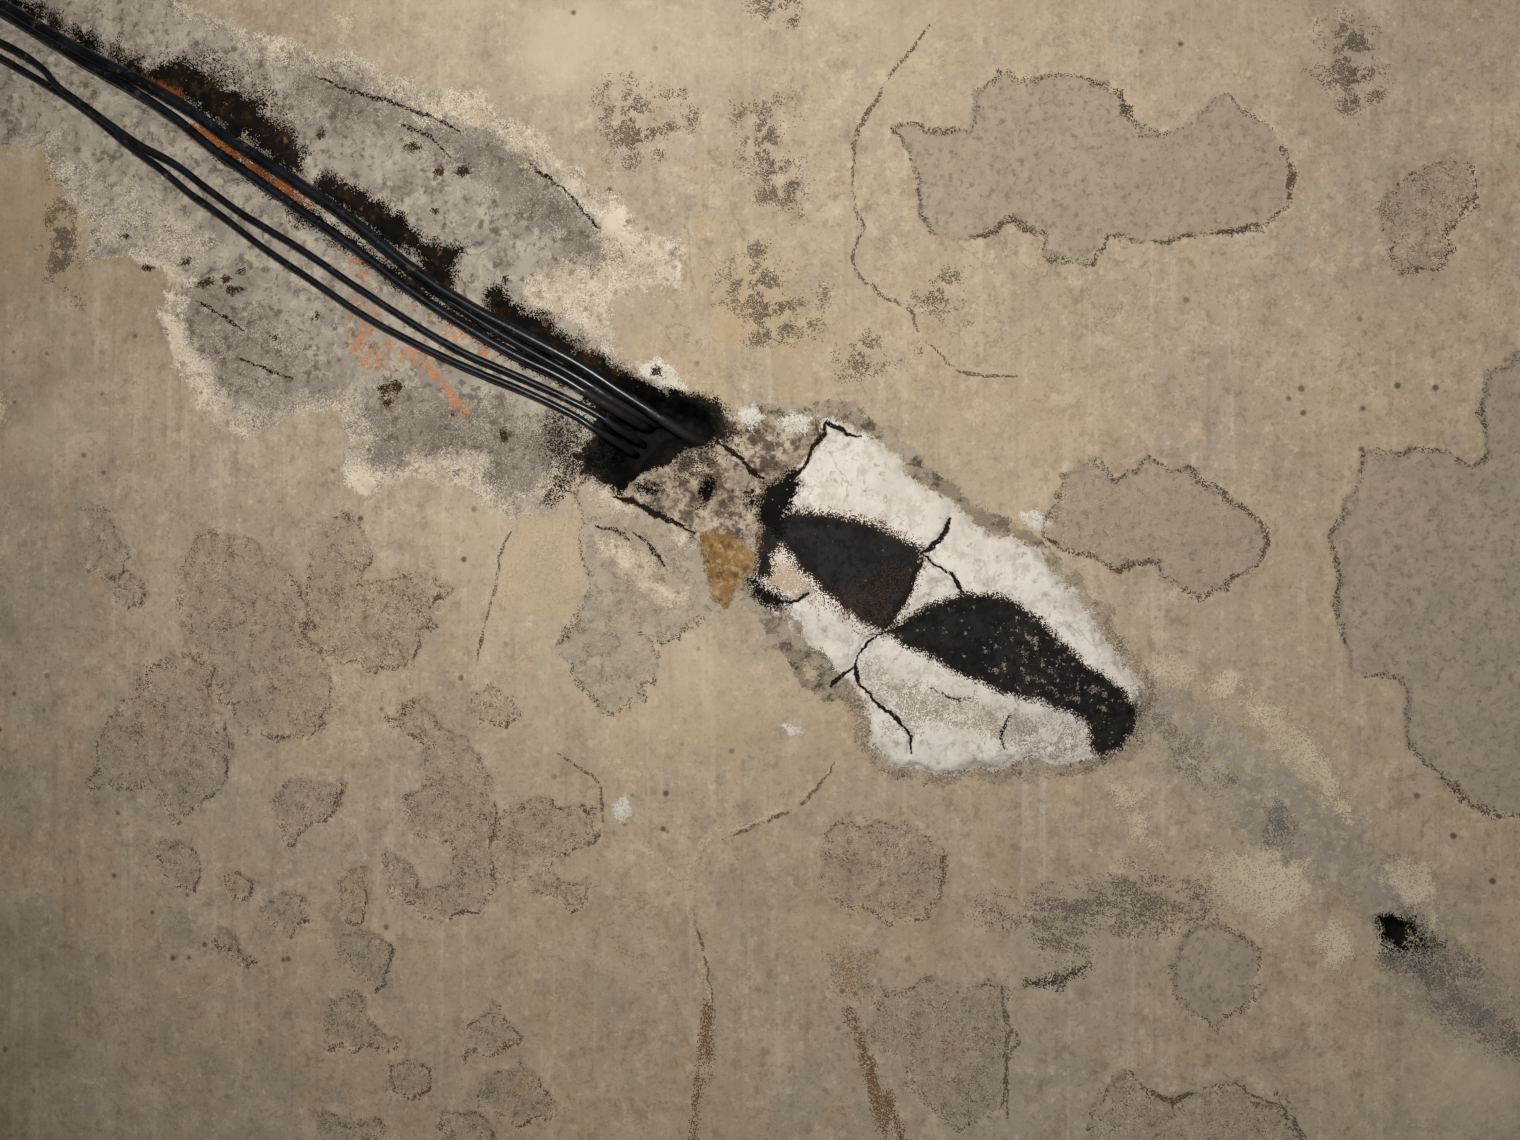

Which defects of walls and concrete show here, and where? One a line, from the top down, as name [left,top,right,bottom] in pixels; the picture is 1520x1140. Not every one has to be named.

crack [734,24,1018,378]
peeling [1369,152,1483,282]
crack [595,496,696,571]
spalling [0,0,1361,953]
crack [713,420,862,480]
crack [785,592,809,604]
crack [829,517,965,754]
crack [998,715,1012,750]